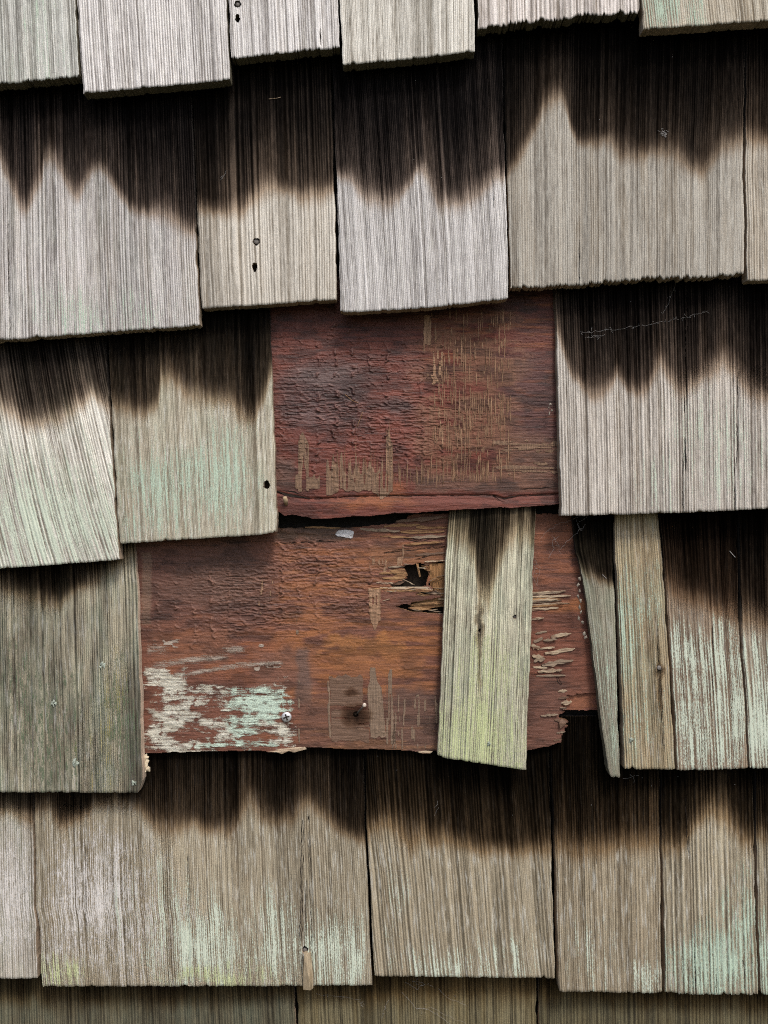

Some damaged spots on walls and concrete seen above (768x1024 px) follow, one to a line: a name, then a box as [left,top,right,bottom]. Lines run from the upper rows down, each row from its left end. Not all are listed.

peeling [143,639,300,752]